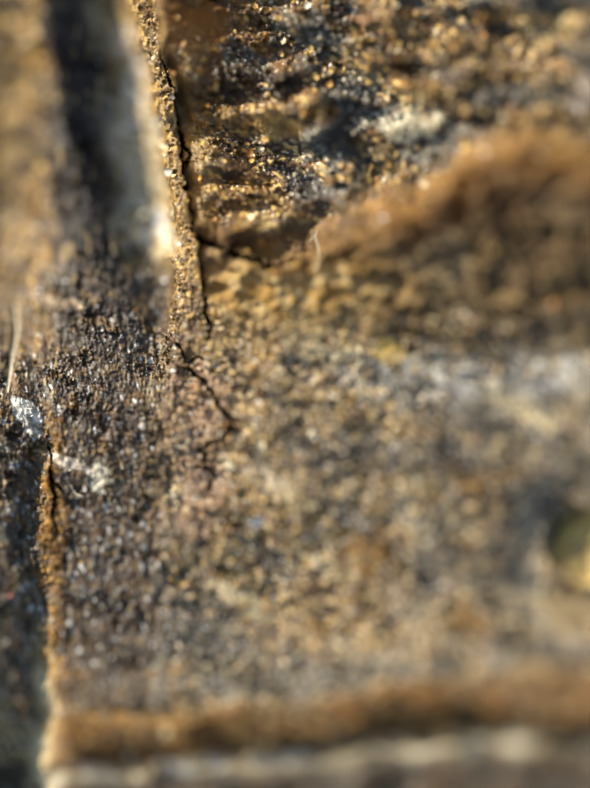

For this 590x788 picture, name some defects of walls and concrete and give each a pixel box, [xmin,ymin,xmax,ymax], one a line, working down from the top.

crack [158,49,302,499]